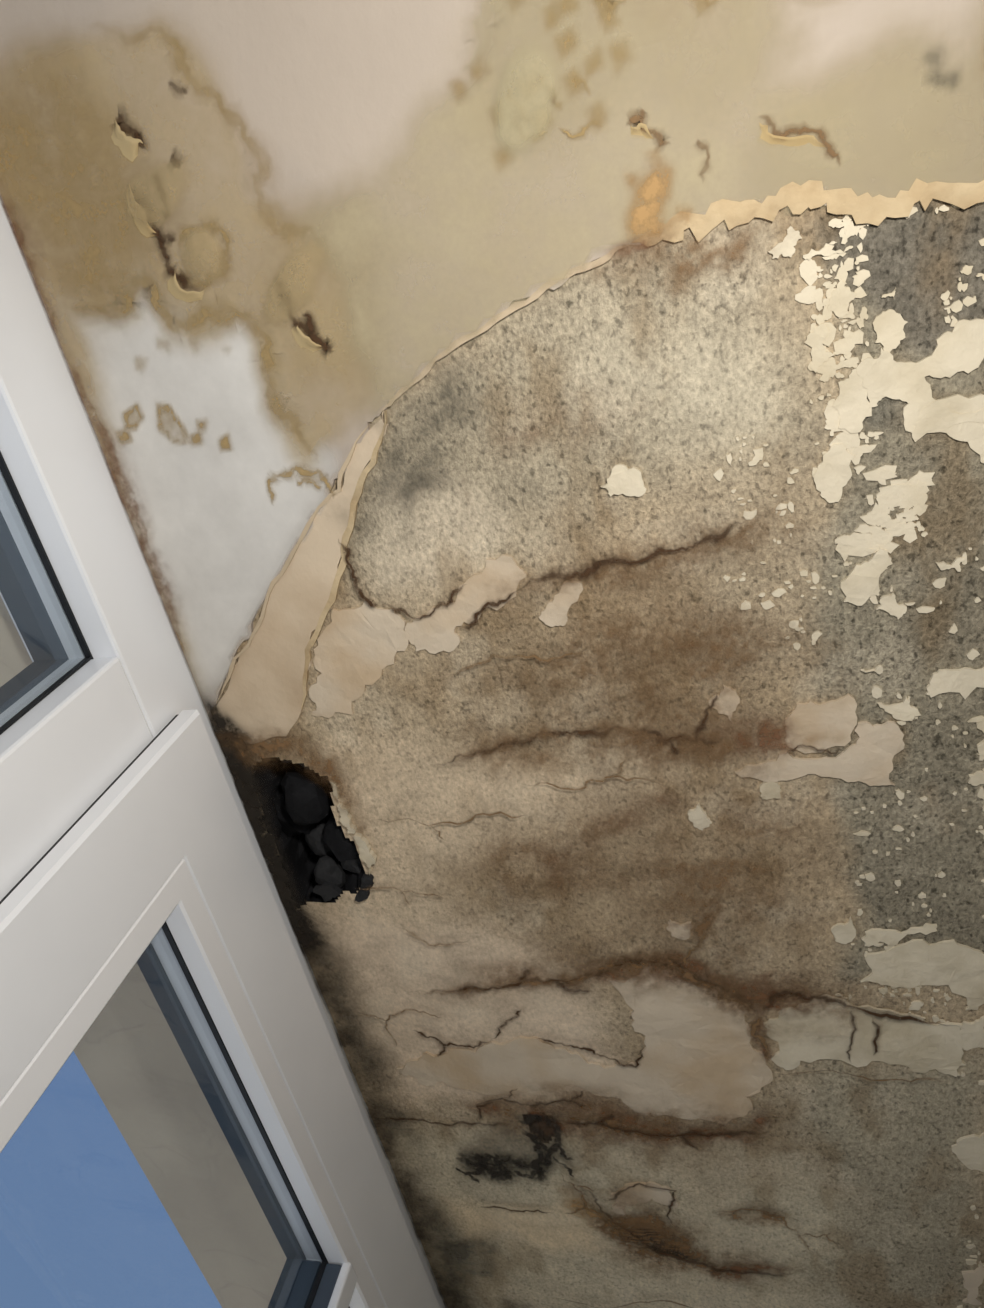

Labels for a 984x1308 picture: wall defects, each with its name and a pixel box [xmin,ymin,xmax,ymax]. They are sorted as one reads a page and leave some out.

water stain [0,0,984,588]
crack [342,526,730,629]
crack [451,696,717,790]
flaking render [214,178,984,1308]
water stain [208,704,351,993]
crack [386,811,520,839]
crack [364,935,947,1082]
water stain [368,1110,394,1157]
water stain [456,1115,574,1183]
crack [383,1089,755,1149]
water stain [397,1180,492,1308]
crack [485,1178,785,1276]